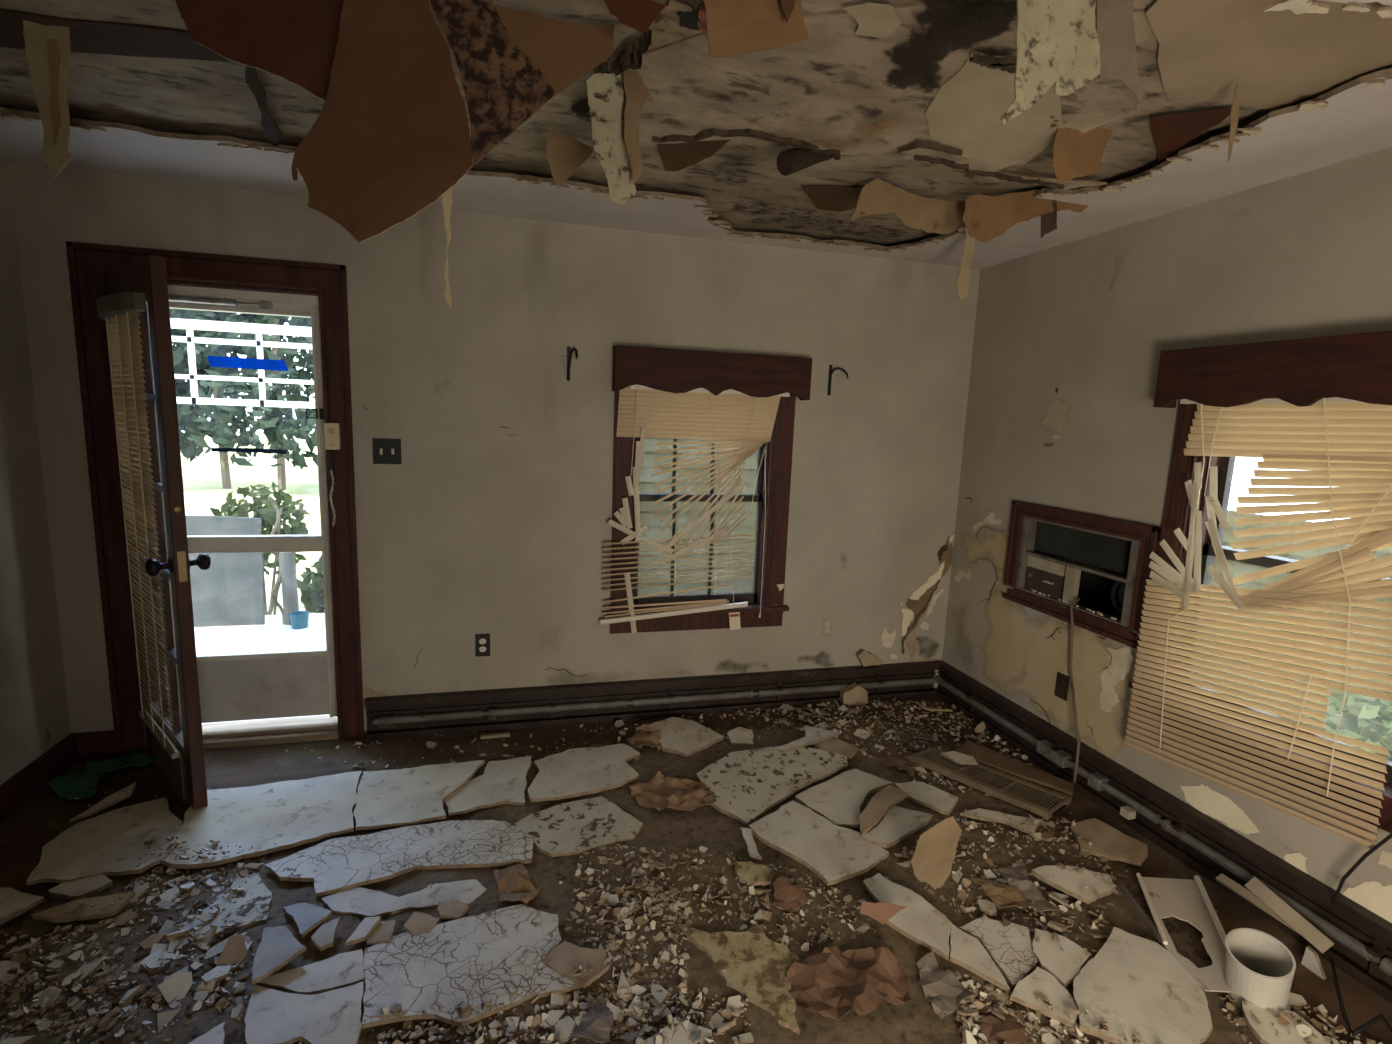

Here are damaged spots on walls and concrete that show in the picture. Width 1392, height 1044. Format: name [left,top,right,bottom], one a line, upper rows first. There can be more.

flaking render [1263,0,1308,12]
damp [885,0,1017,94]
damp [571,99,591,121]
flaking render [881,534,971,663]
peeling [1100,647,1134,713]
peeling [1343,851,1392,923]